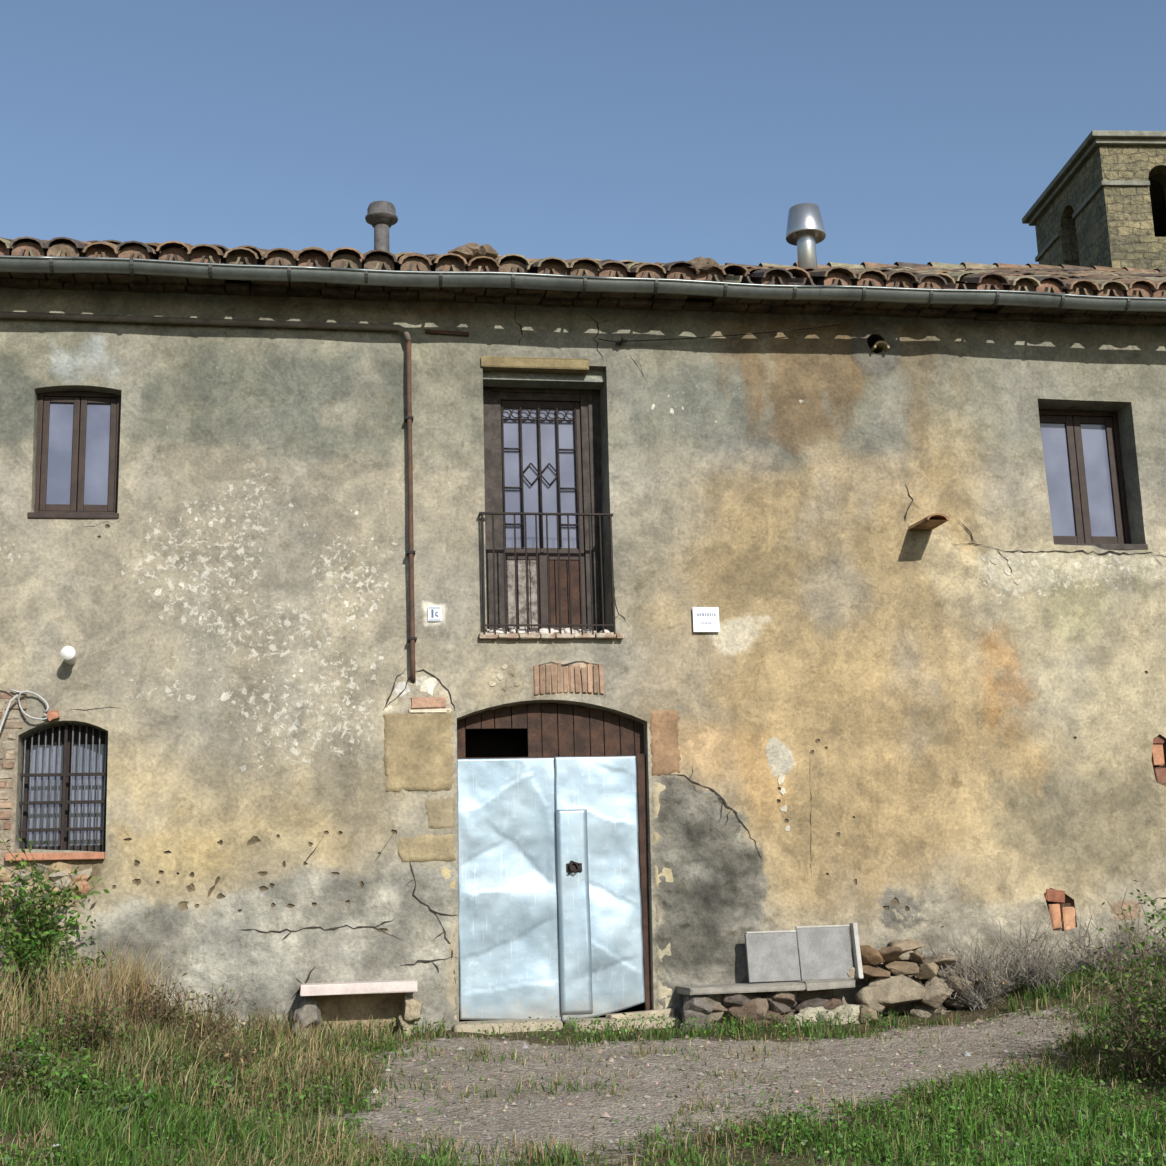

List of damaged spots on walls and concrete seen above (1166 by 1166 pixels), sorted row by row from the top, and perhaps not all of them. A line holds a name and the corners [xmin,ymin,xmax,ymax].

peeling [328,538,388,638]
flaking render [974,546,1166,597]
flaking render [765,736,796,831]
flaking render [0,685,459,1033]
crack [242,861,458,983]
flaking render [649,769,773,1022]